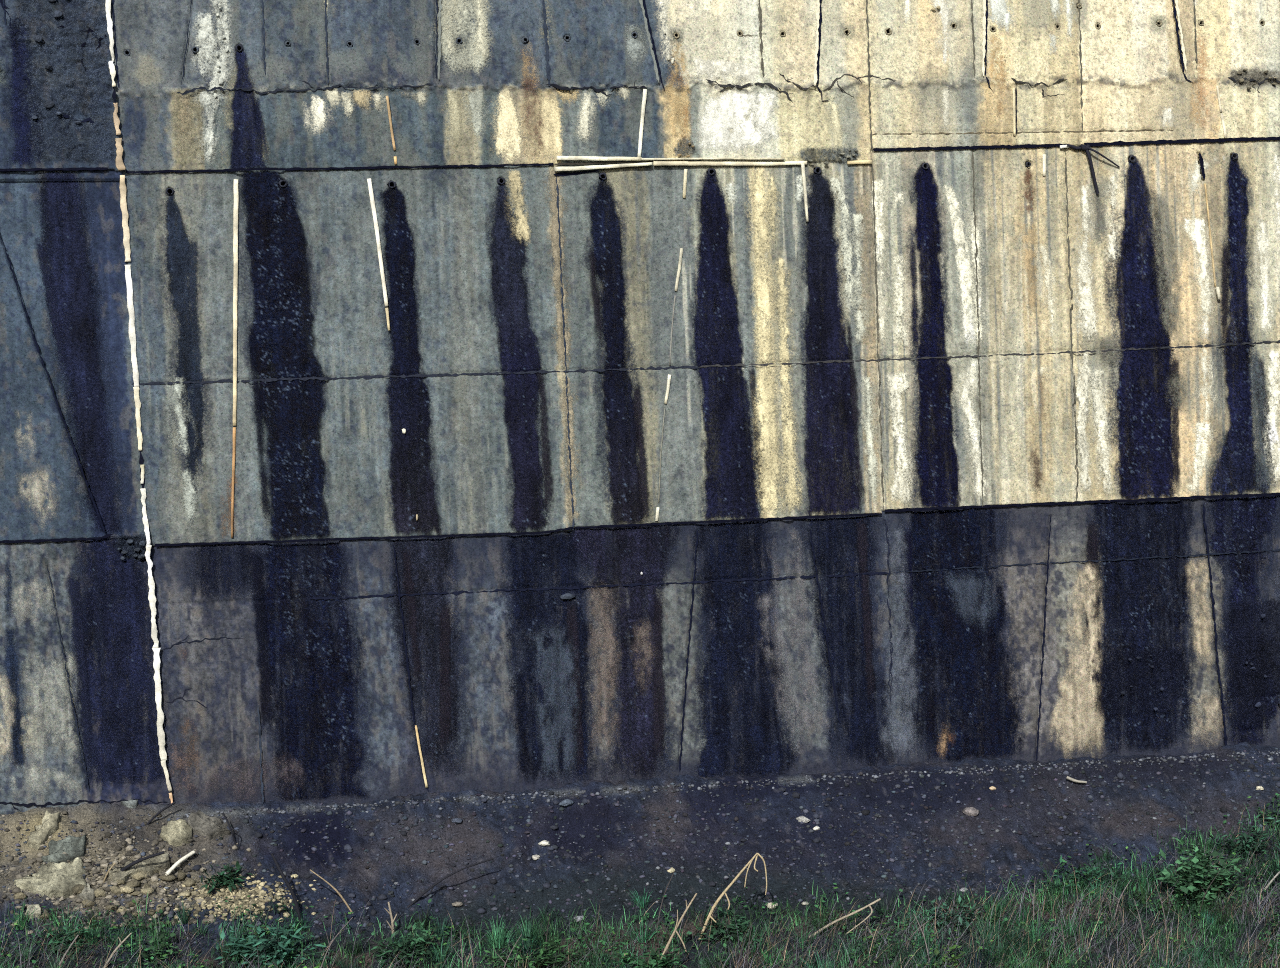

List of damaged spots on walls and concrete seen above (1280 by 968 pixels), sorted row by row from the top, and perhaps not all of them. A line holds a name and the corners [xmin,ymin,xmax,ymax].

crack [0,0,22,35]
crack [57,25,106,71]
damp [438,0,492,72]
damp [657,0,675,64]
damp [693,59,777,153]
crack [706,73,895,101]
damp [0,17,165,788]
damp [161,194,210,521]
damp [185,0,381,800]
damp [381,186,470,771]
damp [448,87,1023,779]
damp [1051,154,1280,752]